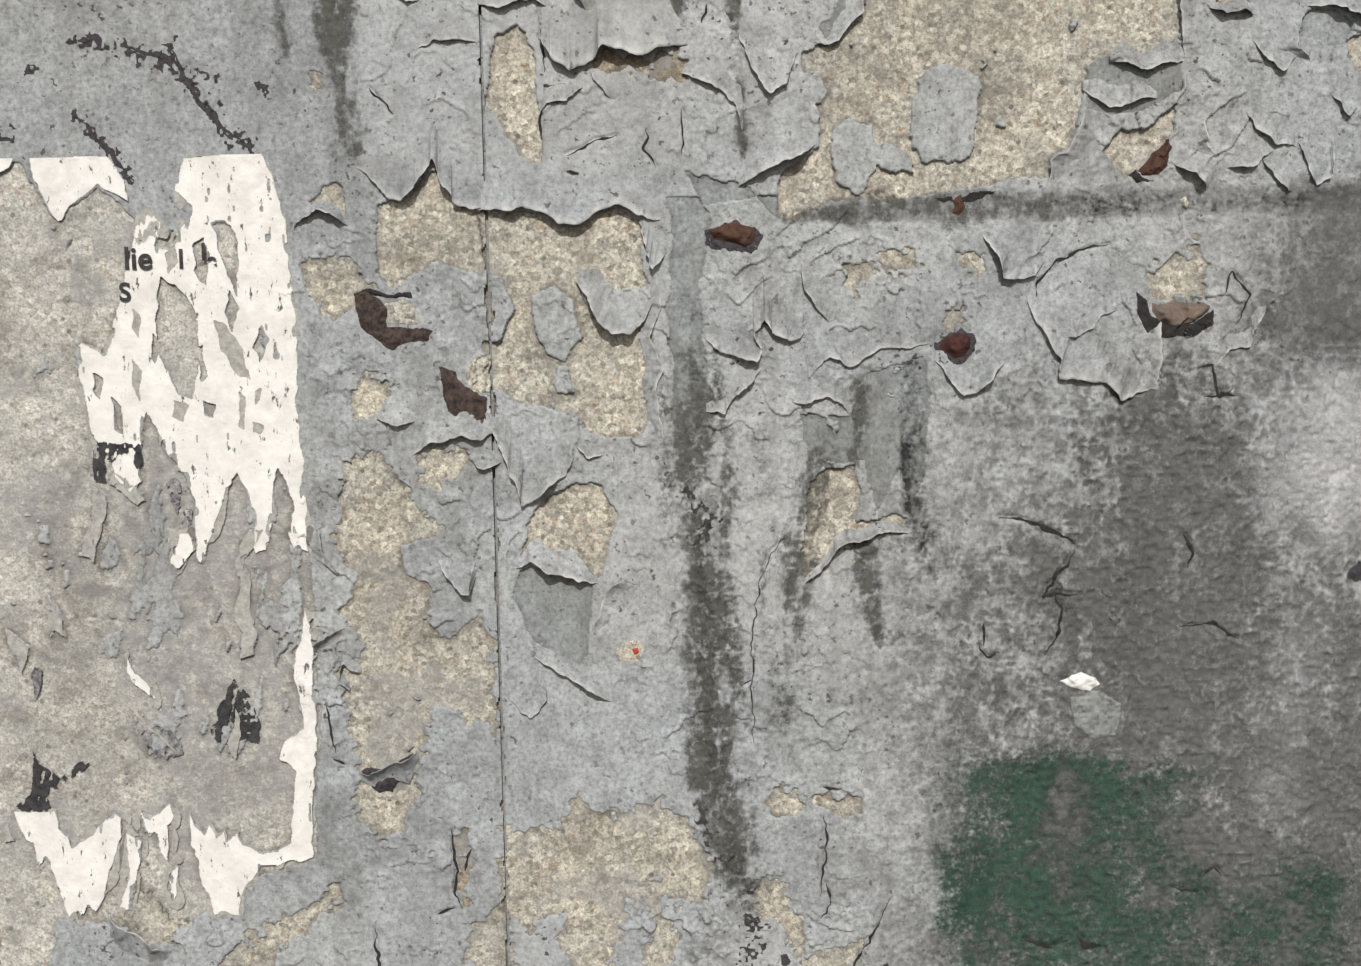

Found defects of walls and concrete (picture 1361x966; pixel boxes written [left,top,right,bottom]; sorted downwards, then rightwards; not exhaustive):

peeling [1209,0,1253,16]
peeling [1227,105,1335,192]
peeling [1253,0,1361,73]
peeling [1332,79,1358,115]
peeling [1217,305,1266,363]
peeling [258,0,1216,876]
peeling [0,163,348,966]
damp [664,348,760,921]
damp [935,186,1361,966]
peeling [451,791,868,966]